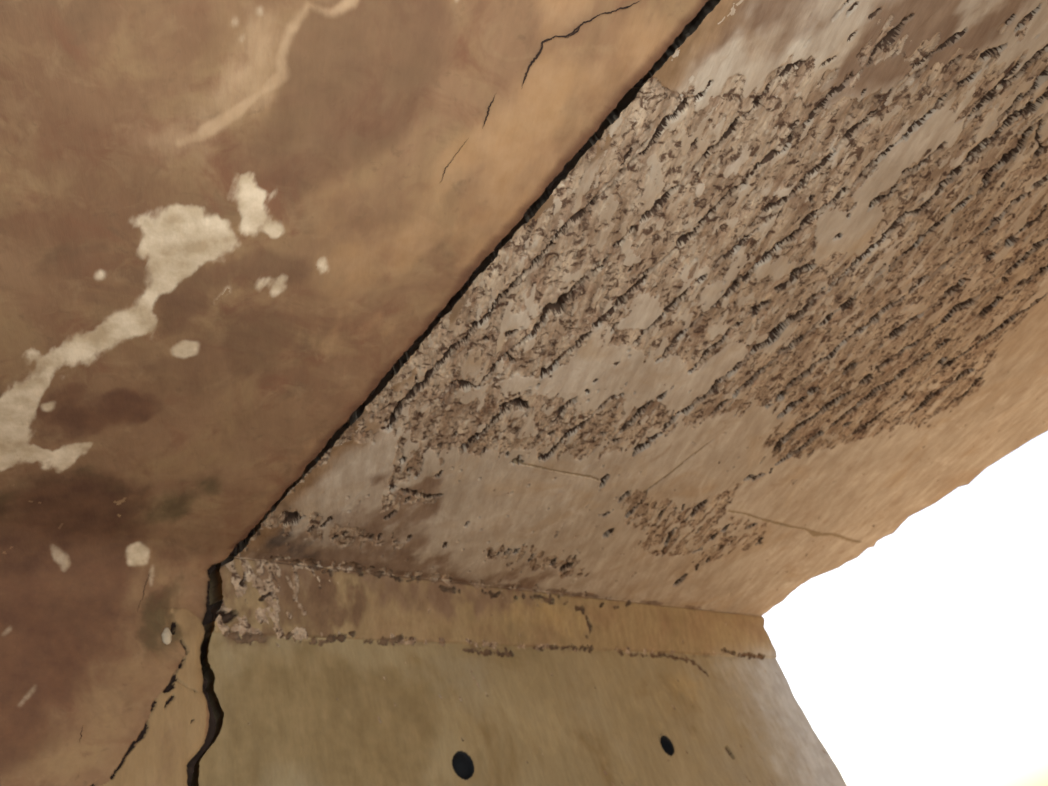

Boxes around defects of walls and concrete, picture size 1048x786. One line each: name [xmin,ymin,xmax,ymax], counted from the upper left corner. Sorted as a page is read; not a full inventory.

crack [442,95,495,179]
crack [522,1,639,85]
damp [680,116,723,155]
spalling [676,56,853,246]
spalling [703,153,852,305]
damp [798,118,815,142]
damp [652,0,1048,128]
spalling [841,70,1048,286]
spalling [381,199,607,430]
damp [0,0,709,786]
spalling [215,554,588,646]
crack [90,640,216,786]